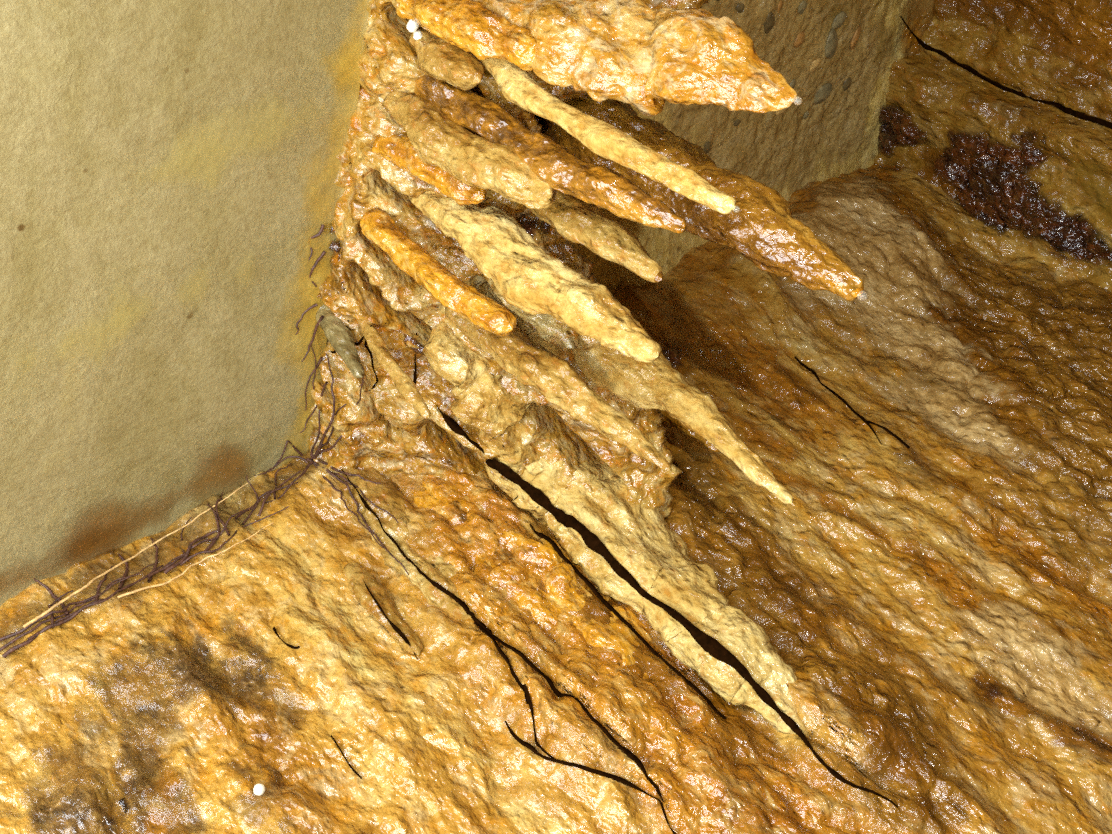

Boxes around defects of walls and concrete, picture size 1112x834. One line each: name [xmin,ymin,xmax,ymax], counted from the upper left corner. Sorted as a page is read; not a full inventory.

crack [900,16,1112,129]
rust [902,0,1112,88]
damp [293,260,331,369]
crack [329,325,379,392]
crack [411,332,419,385]
crack [341,469,676,834]
crack [436,405,898,808]
damp [403,456,965,834]